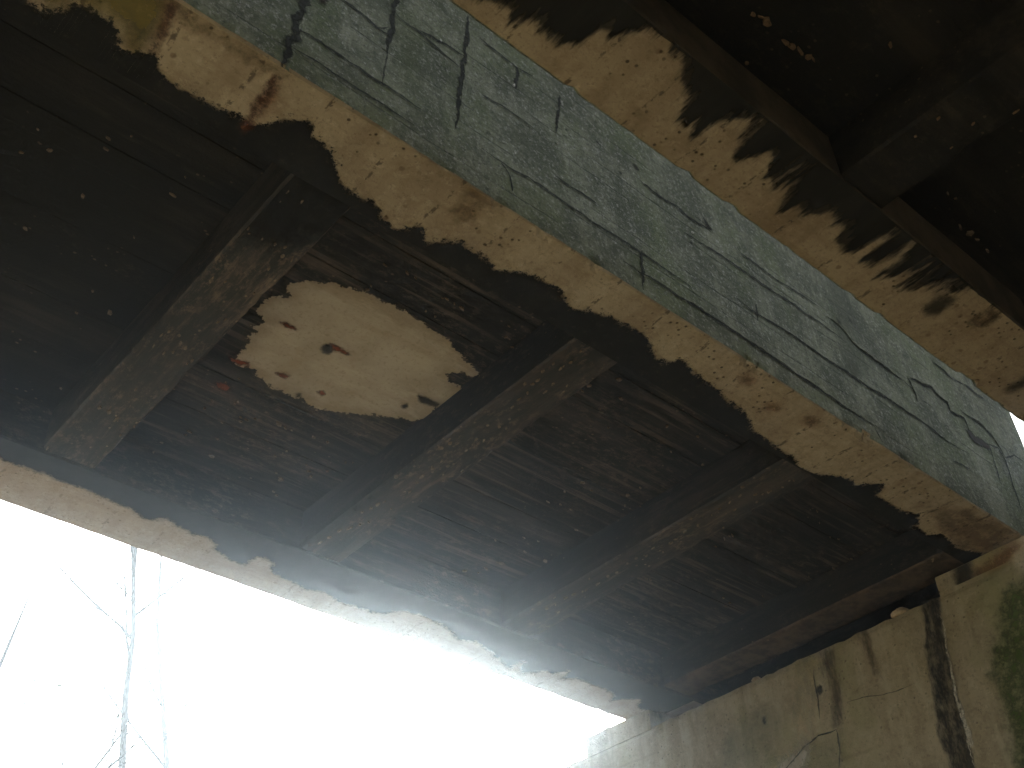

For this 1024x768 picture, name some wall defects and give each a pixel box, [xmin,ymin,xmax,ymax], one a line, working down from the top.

rust [241,76,280,130]
crack [281,0,561,132]
peeling [229,280,479,421]
crack [482,148,1024,512]
damp [925,297,953,315]
damp [922,596,975,768]